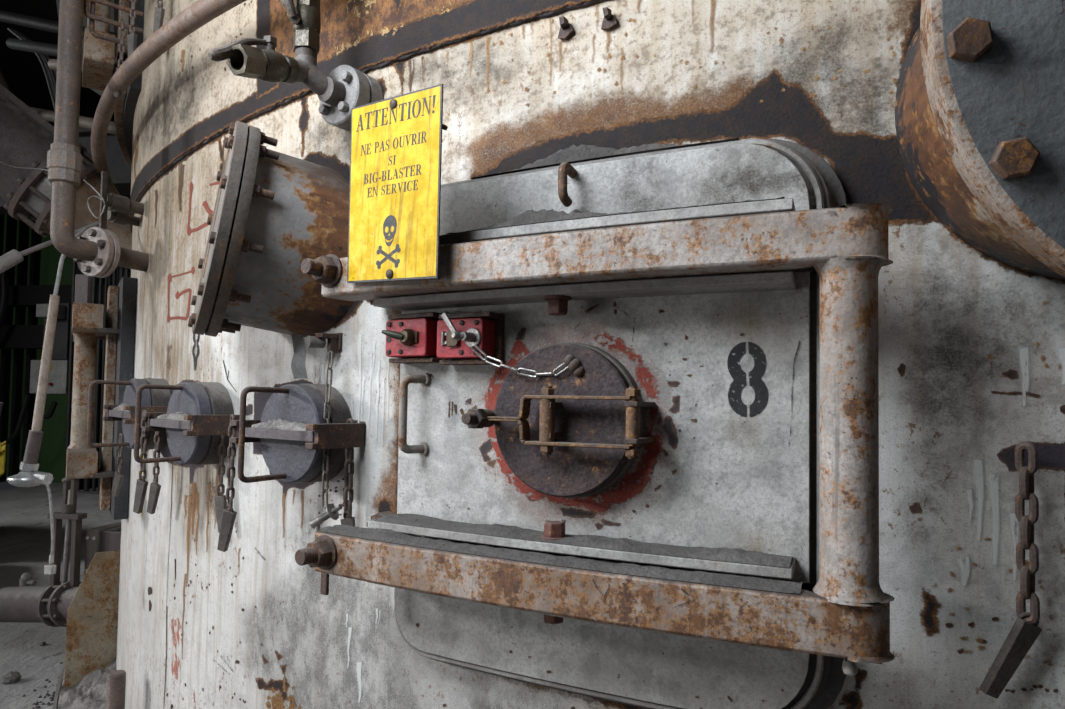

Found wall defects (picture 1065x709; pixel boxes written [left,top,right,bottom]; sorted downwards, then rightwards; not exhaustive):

rust [271,0,295,59]
peeling [335,0,403,55]
rust [317,0,471,62]
rust [486,24,532,92]
rust [593,3,638,73]
rust [710,0,724,64]
rust [469,78,753,173]
rust [991,369,1040,398]
rust [909,502,922,513]
rust [182,464,219,659]
rust [945,608,986,654]
rust [266,678,301,709]